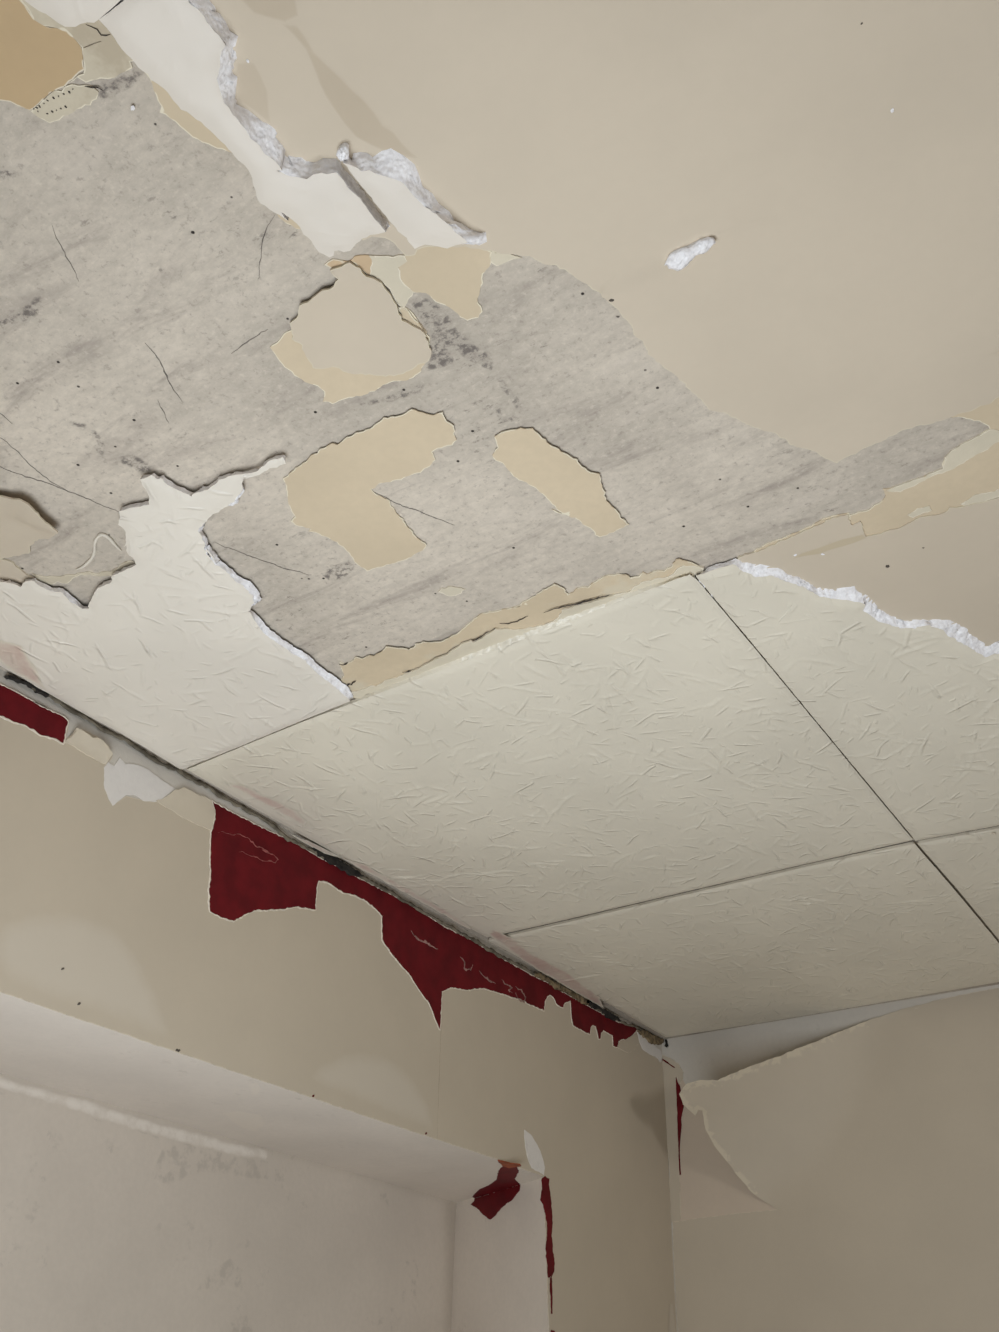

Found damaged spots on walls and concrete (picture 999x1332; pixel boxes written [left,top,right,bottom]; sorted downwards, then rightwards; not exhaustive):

peeling [210,0,999,646]
peeling [0,495,135,585]
peeling [340,558,704,699]
peeling [540,1176,555,1314]